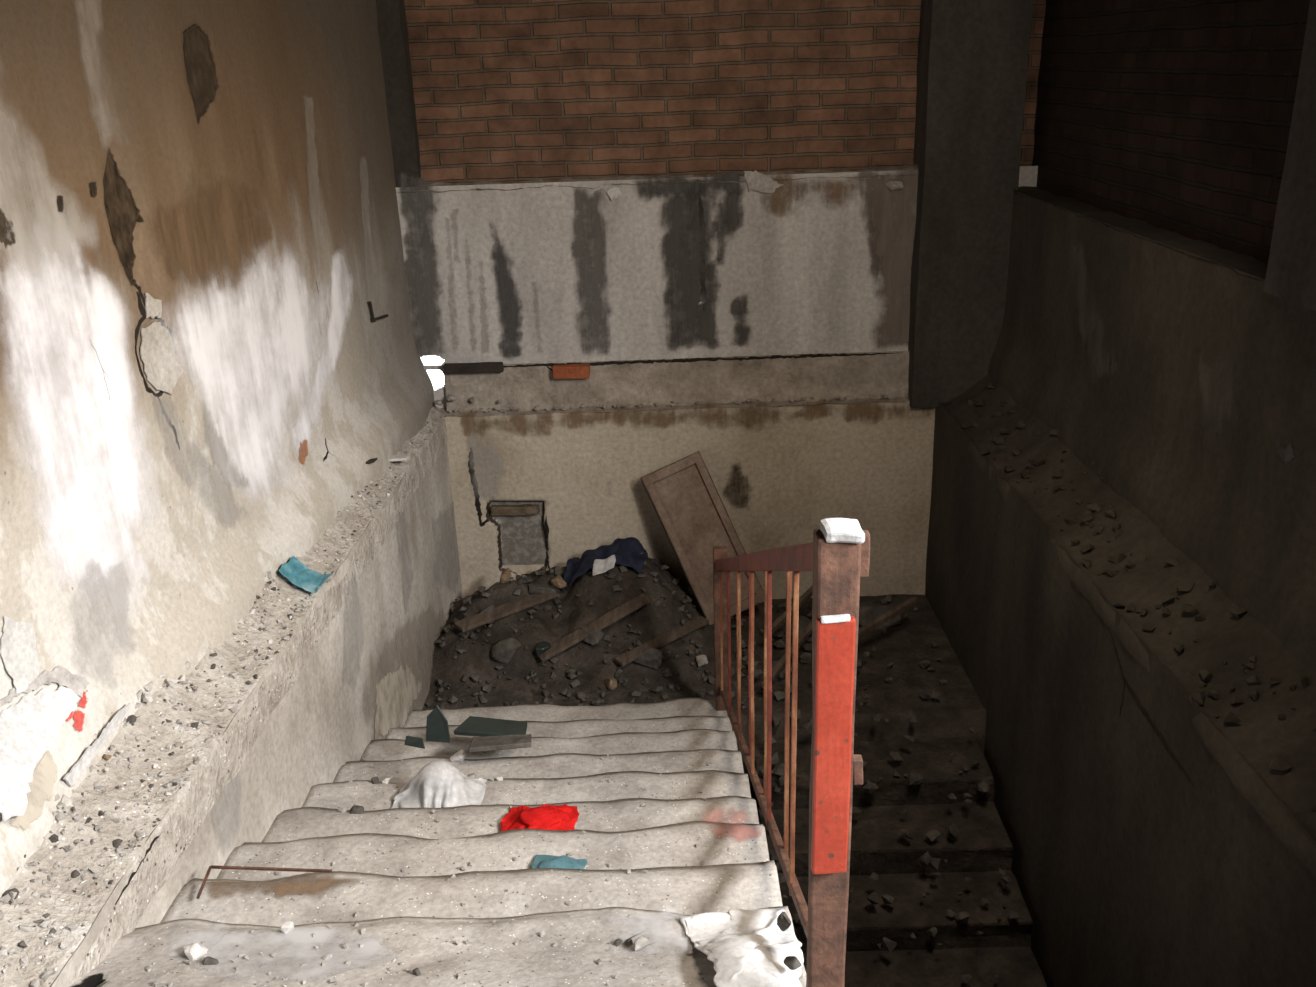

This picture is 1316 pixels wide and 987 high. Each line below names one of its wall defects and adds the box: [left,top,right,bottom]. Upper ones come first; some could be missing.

flaking render [183,24,219,124]
leakage [0,113,146,611]
leakage [159,181,352,493]
leakage [400,173,452,364]
leakage [471,239,522,357]
leakage [572,189,611,353]
leakage [637,171,743,349]
leakage [731,297,750,346]
leakage [771,167,918,347]
peeling [0,616,90,830]